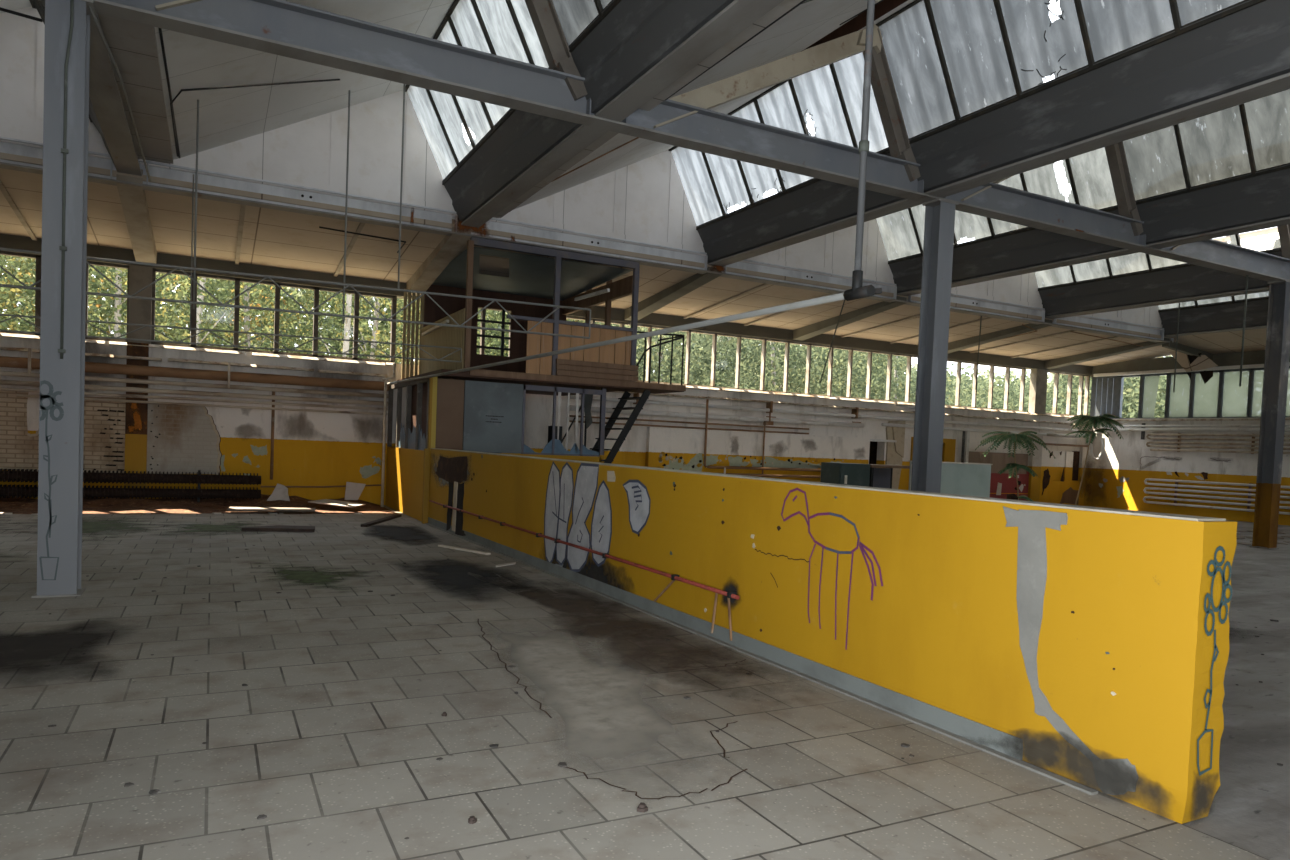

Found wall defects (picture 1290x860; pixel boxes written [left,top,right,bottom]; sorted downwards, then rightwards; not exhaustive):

damp [0,624,116,674]
crack [477,619,552,718]
crack [566,721,747,799]
damp [1007,731,1164,817]
damp [1193,779,1213,820]